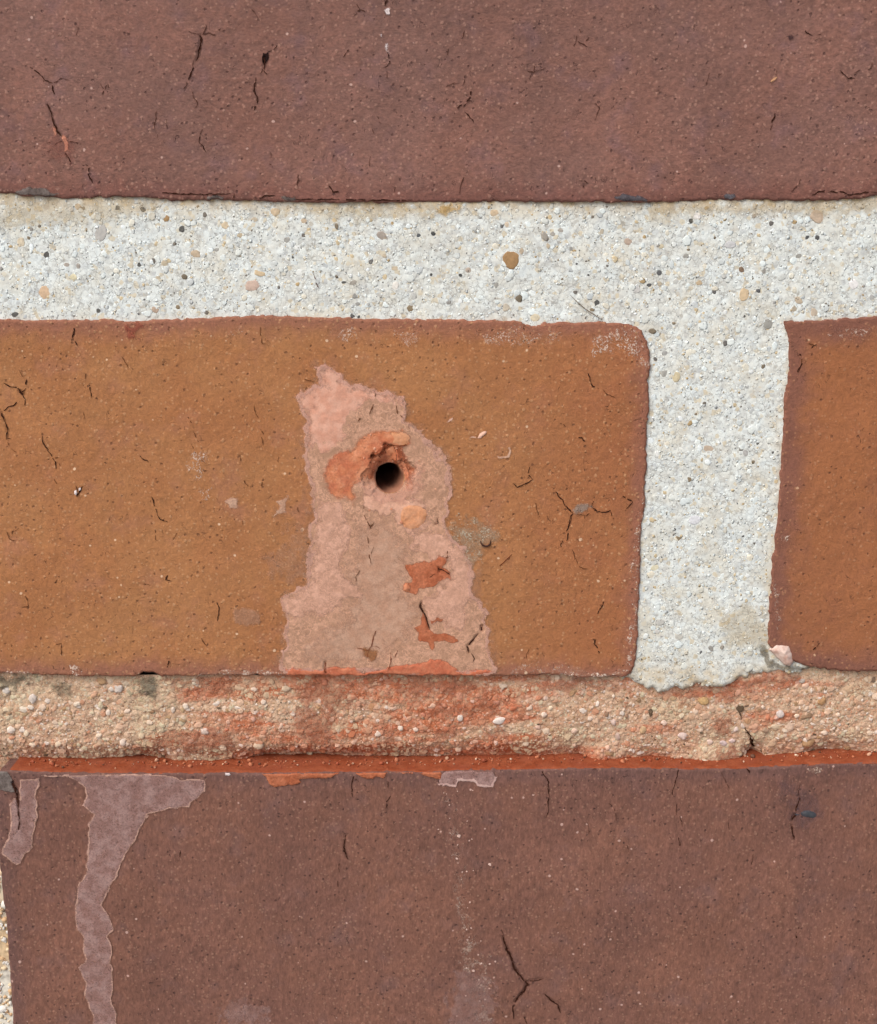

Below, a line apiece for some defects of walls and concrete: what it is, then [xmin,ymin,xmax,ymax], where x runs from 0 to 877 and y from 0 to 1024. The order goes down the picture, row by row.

crack [30,67,93,183]
crack [184,27,221,152]
peeling [372,432,410,458]
crack [513,467,633,569]
crack [501,929,561,1023]